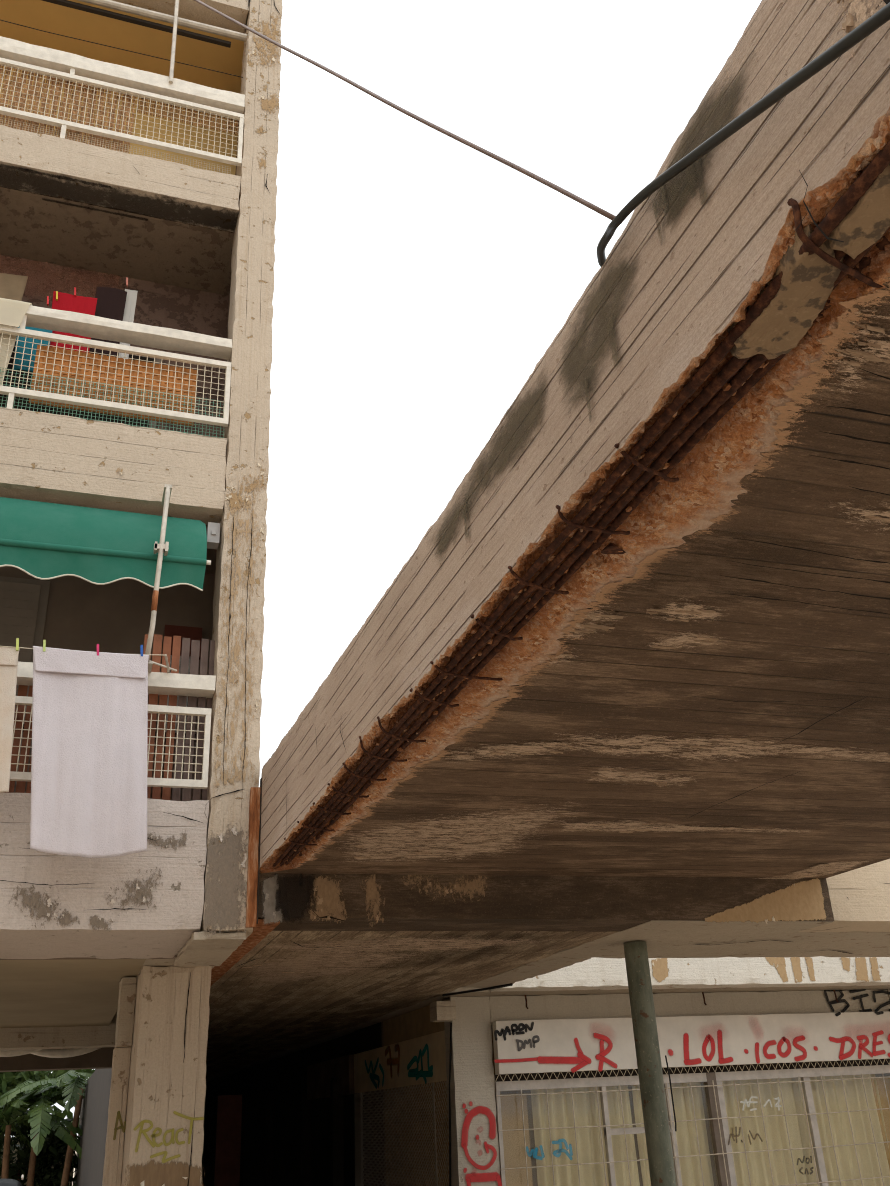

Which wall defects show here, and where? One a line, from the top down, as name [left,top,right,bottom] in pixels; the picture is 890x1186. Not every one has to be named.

peeling [823,0,886,44]
peeling [258,93,280,113]
water stain [0,164,238,231]
water stain [560,260,636,420]
water stain [436,380,545,555]
spalling [256,107,890,956]
peeling [214,459,267,789]
peeling [147,830,194,849]
peeling [9,867,165,931]
peeling [204,823,248,936]
peeling [765,957,816,983]
peeling [841,957,881,982]